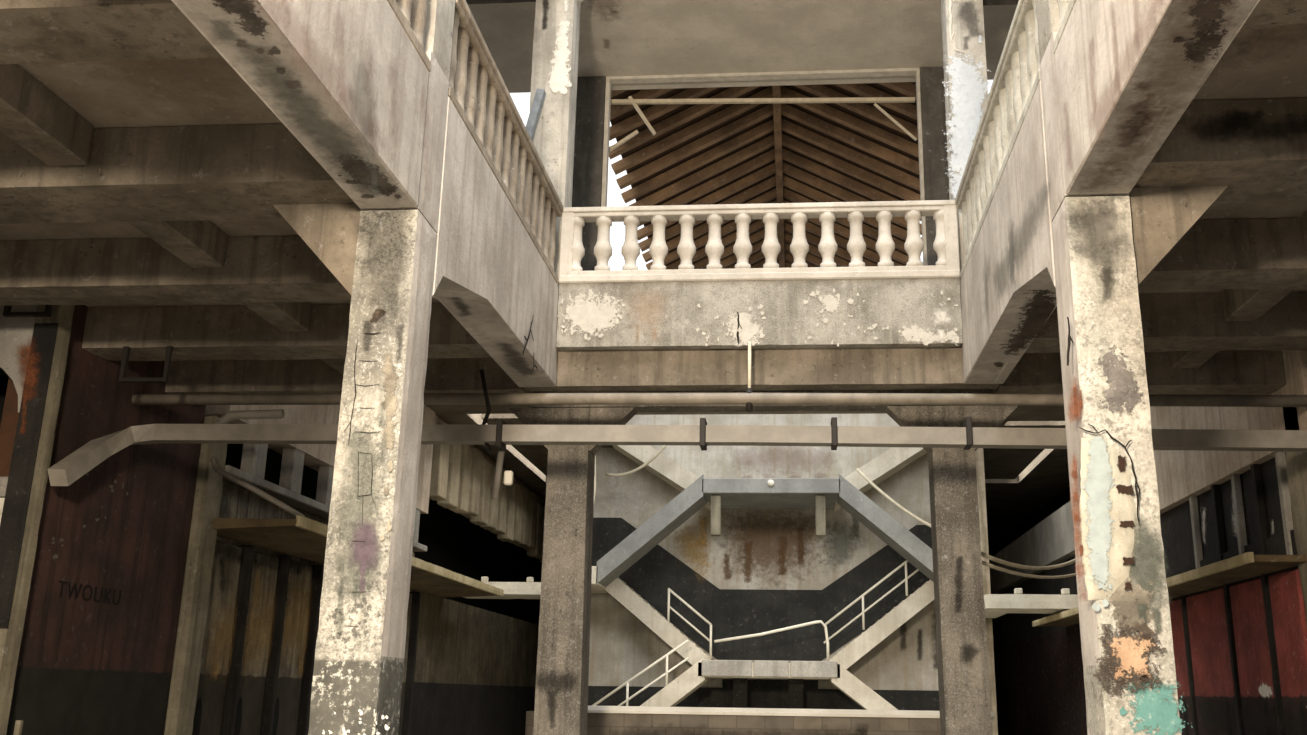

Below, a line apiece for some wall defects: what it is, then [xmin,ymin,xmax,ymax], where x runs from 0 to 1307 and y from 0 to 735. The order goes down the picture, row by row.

peeling [547,0,572,95]
peeling [942,35,991,199]
damp [1196,112,1307,139]
peeling [557,289,628,341]
peeling [695,304,766,347]
peeling [803,288,960,345]
crack [1079,424,1140,523]
spalling [1081,436,1188,735]
peeling [1258,683,1273,699]
peeling [322,709,390,735]